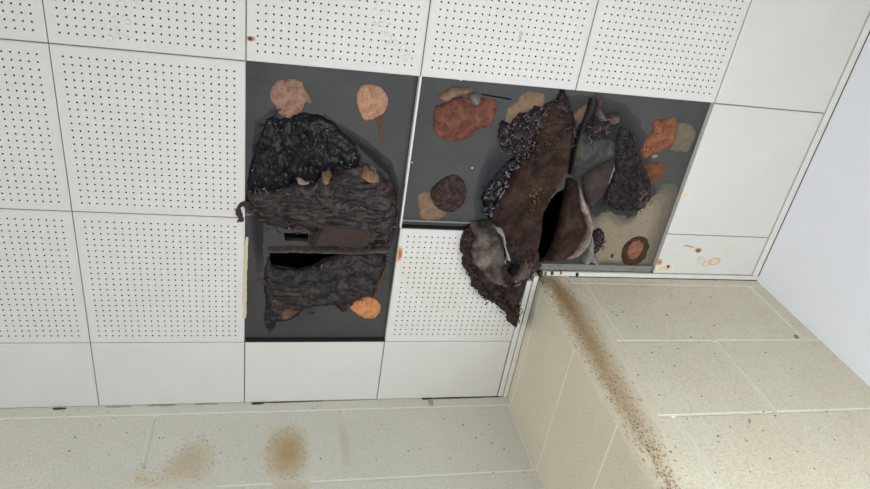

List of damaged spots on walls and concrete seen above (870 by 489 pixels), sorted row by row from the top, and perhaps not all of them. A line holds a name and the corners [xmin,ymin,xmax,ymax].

spalling [522,89,577,165]
water stain [541,276,693,489]
water stain [113,434,222,489]
water stain [258,422,312,489]